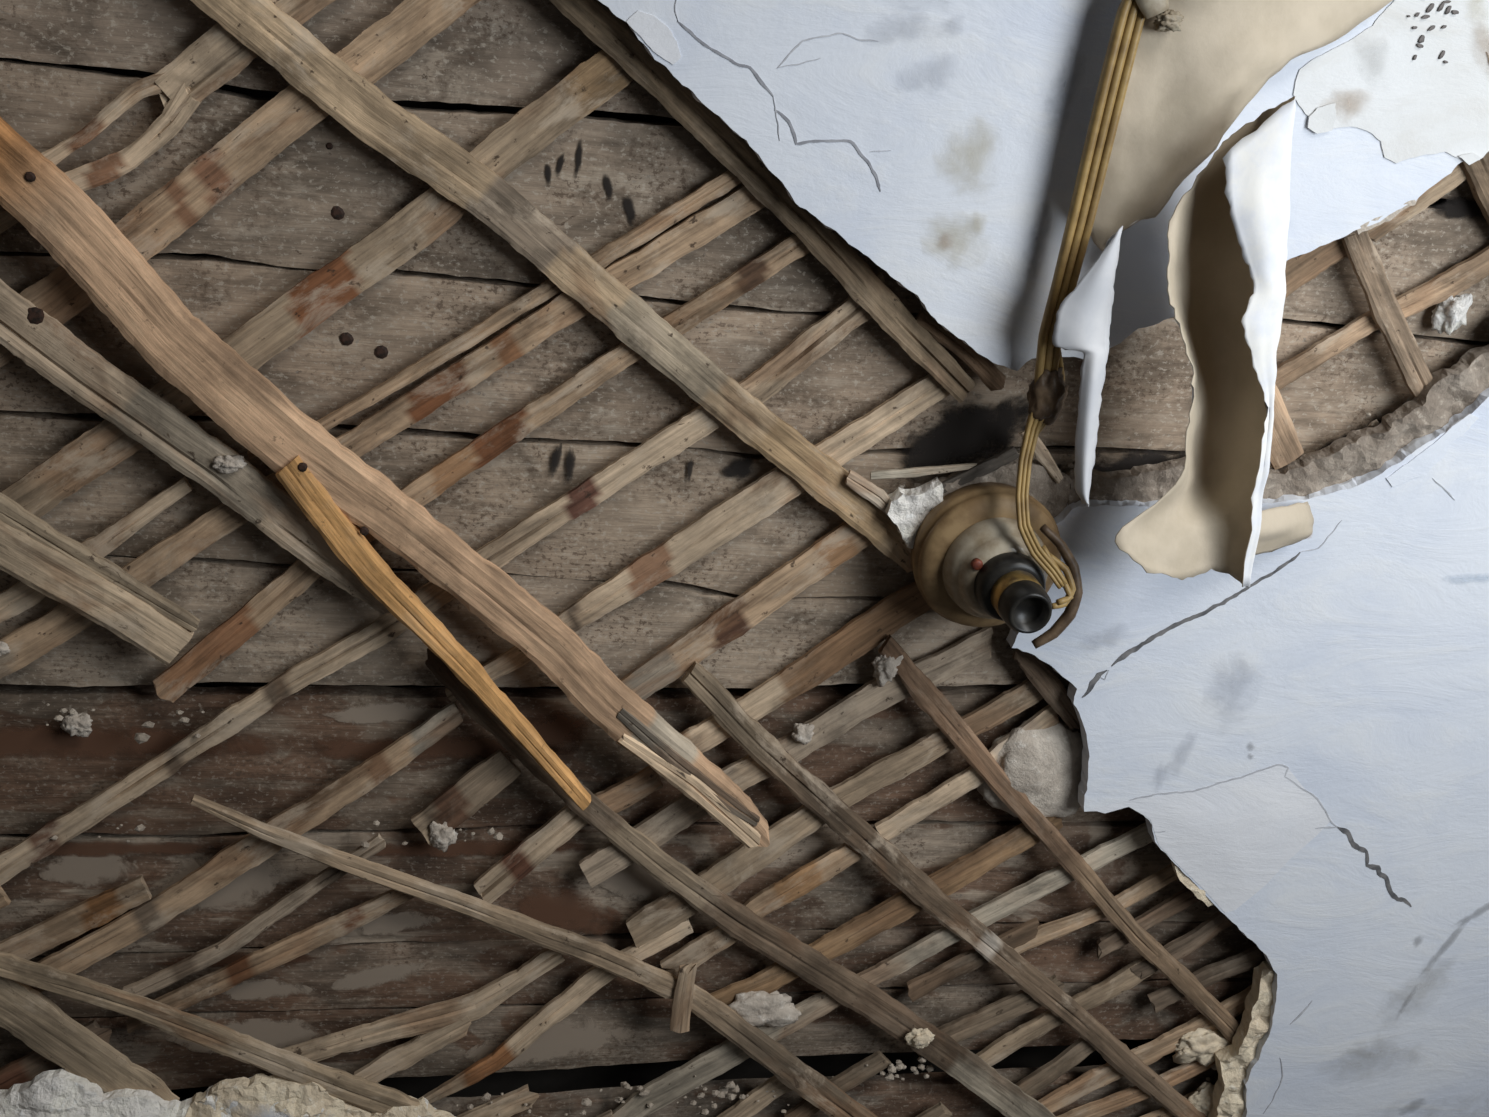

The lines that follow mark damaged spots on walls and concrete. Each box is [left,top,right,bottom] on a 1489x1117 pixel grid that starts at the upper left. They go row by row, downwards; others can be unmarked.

peeling [626,11,681,64]
crack [674,0,891,192]
flaking render [885,456,1186,549]
crack [1082,520,1342,698]
flaking render [1171,861,1214,907]
crack [1130,764,1412,907]
flaking render [185,1073,456,1117]
flaking render [1207,960,1274,1117]